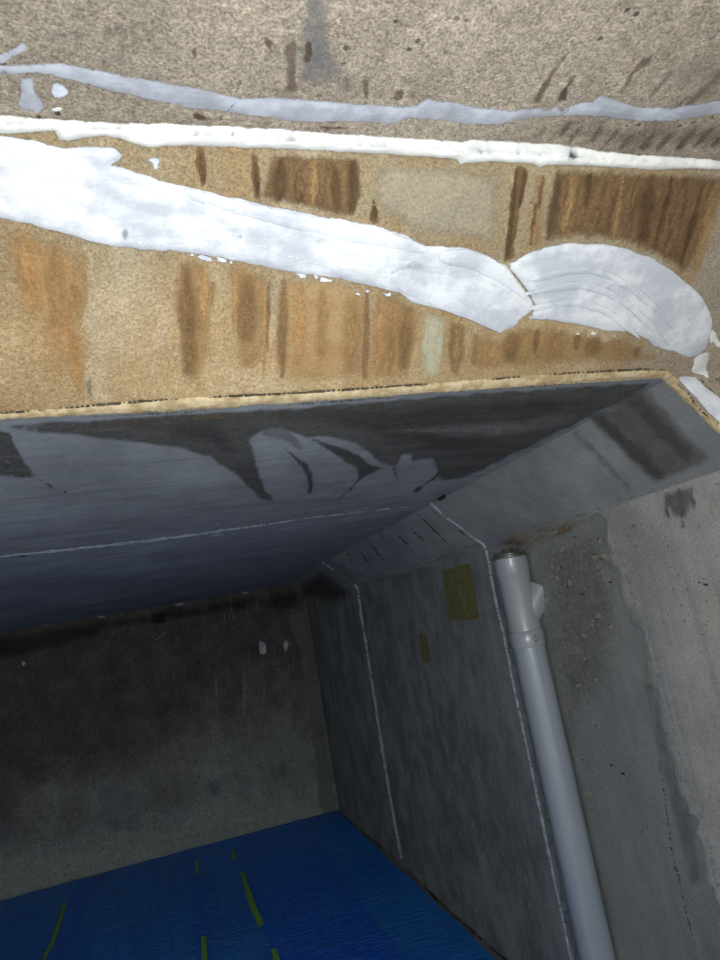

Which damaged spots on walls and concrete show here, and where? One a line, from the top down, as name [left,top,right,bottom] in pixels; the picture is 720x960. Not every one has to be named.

leakage [535,57,565,102]
leakage [592,128,720,150]
corrosion [251,155,359,213]
leakage [379,170,497,239]
corrosion [504,167,527,260]
corrosion [530,173,720,270]
corrosion [179,267,214,375]
corrosion [233,275,417,378]
leakage [422,317,443,375]
crack [688,377,720,426]
leakage [0,384,705,500]